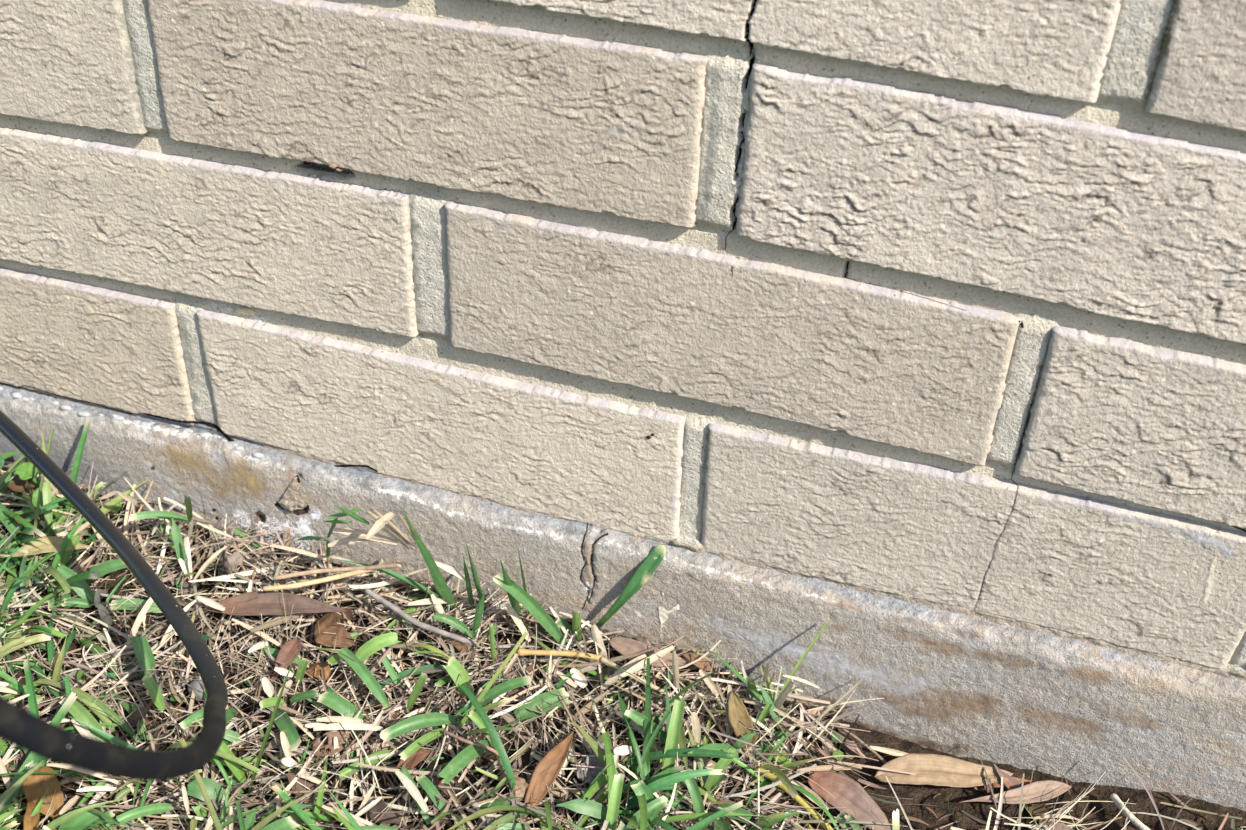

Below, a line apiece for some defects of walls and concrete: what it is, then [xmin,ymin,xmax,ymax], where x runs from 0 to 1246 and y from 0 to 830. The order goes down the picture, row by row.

crack [725,0,757,277]
crack [844,261,967,311]
crack [580,523,608,610]
crack [975,320,1052,610]